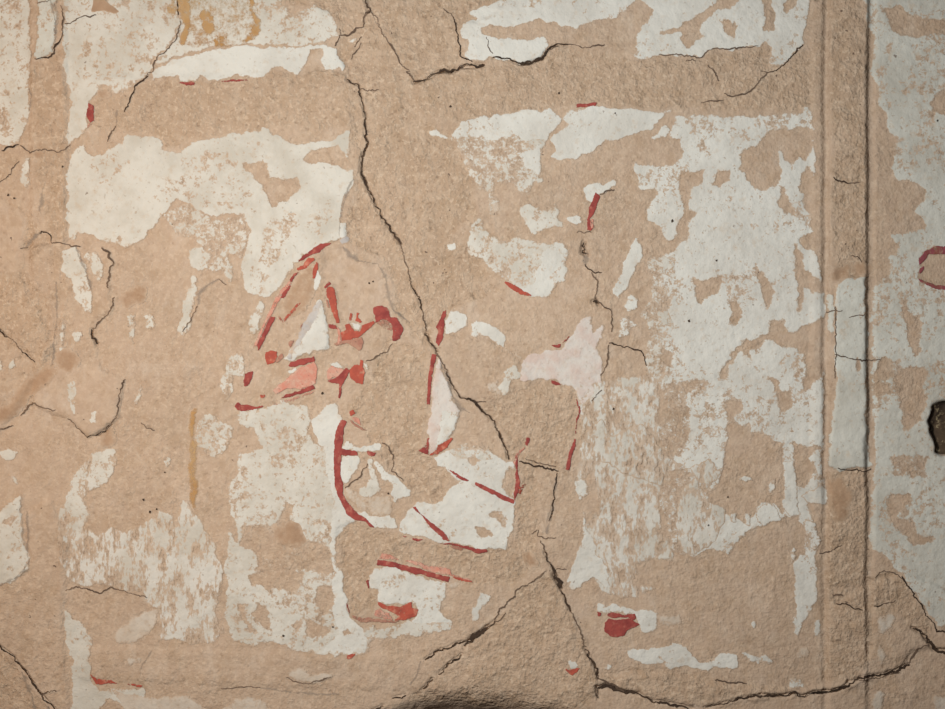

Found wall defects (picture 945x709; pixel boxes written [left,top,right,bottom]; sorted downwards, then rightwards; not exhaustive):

crack [0,144,70,182]
crack [107,21,181,142]
flaking render [0,0,352,254]
flaking render [0,257,65,373]
crack [1,379,125,438]
crack [20,231,115,344]
flaking render [60,0,636,550]
crack [335,0,945,709]
peeling [415,0,945,687]
peeling [0,476,31,585]
peeling [56,399,804,709]
crack [0,646,56,708]